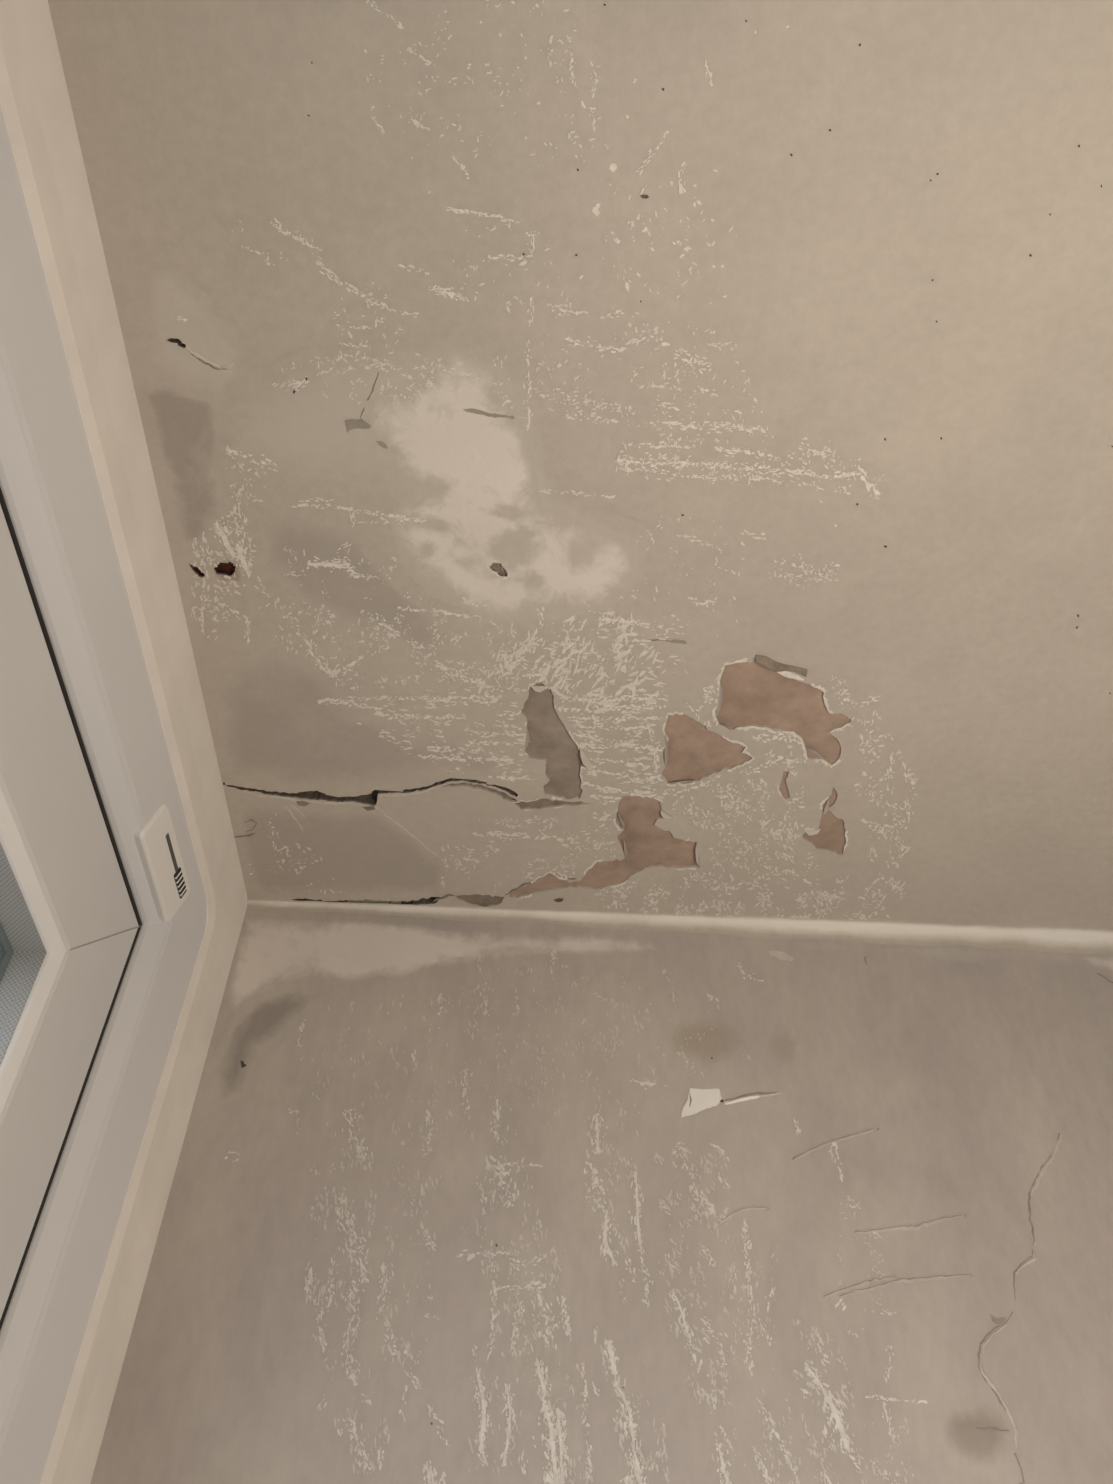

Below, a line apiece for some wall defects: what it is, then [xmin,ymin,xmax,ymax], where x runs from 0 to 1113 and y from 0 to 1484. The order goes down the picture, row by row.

water stain [270,218,419,318]
crack [223,778,577,906]
water stain [137,262,807,1110]
peeling [510,654,851,902]
flaking render [681,1088,782,1118]
crack [977,1133,1062,1484]